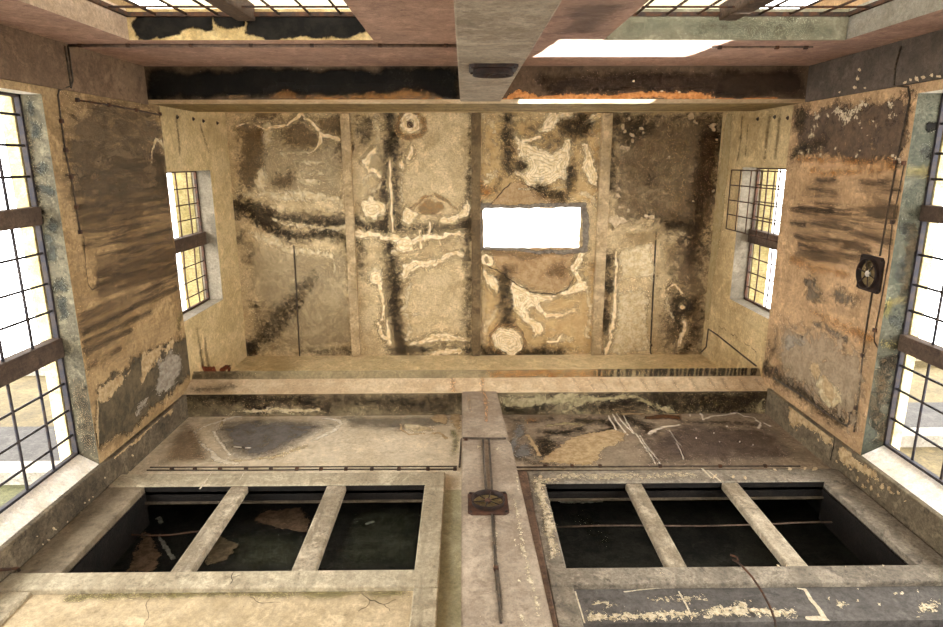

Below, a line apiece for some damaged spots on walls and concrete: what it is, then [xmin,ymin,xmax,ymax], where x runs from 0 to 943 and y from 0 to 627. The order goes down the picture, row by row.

leakage [921,121,937,159]
leakage [79,187,178,355]
leakage [236,113,748,356]
leakage [791,206,918,330]
flaking render [95,336,190,459]
leakage [193,407,343,489]
leakage [594,321,898,444]
peeling [585,554,798,627]
peeling [917,589,940,617]